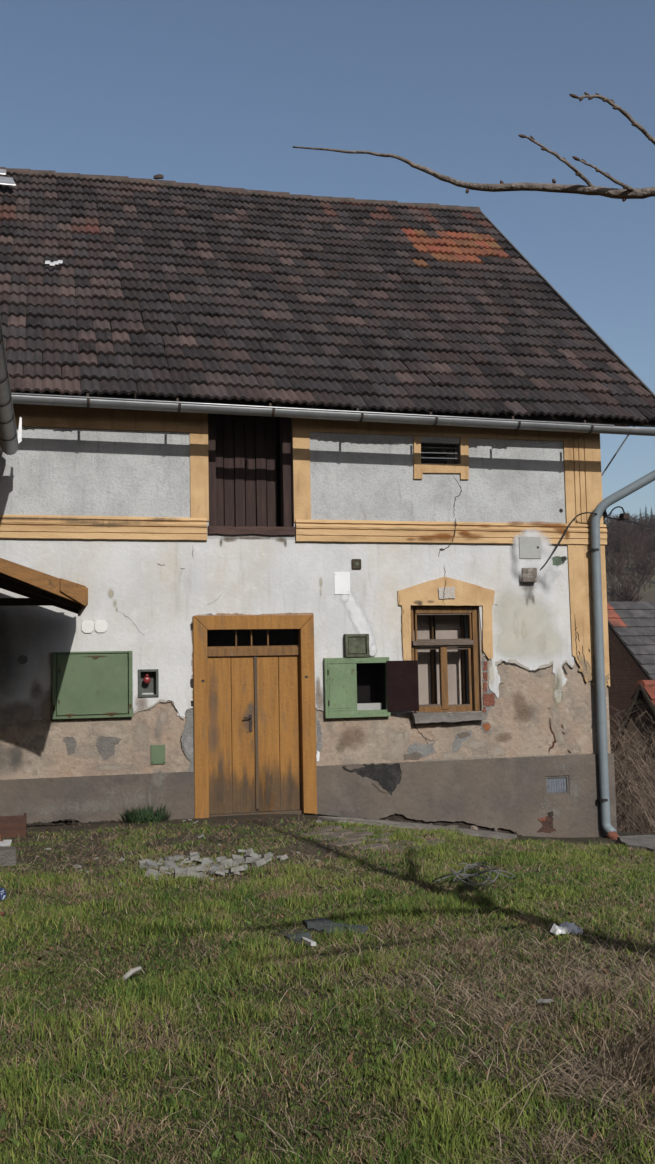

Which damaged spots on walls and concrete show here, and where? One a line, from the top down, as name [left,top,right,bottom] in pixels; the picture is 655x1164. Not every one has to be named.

crack [439,478,462,601]
peeling [0,699,194,780]
spalling [190,613,314,706]
peeling [316,654,611,778]